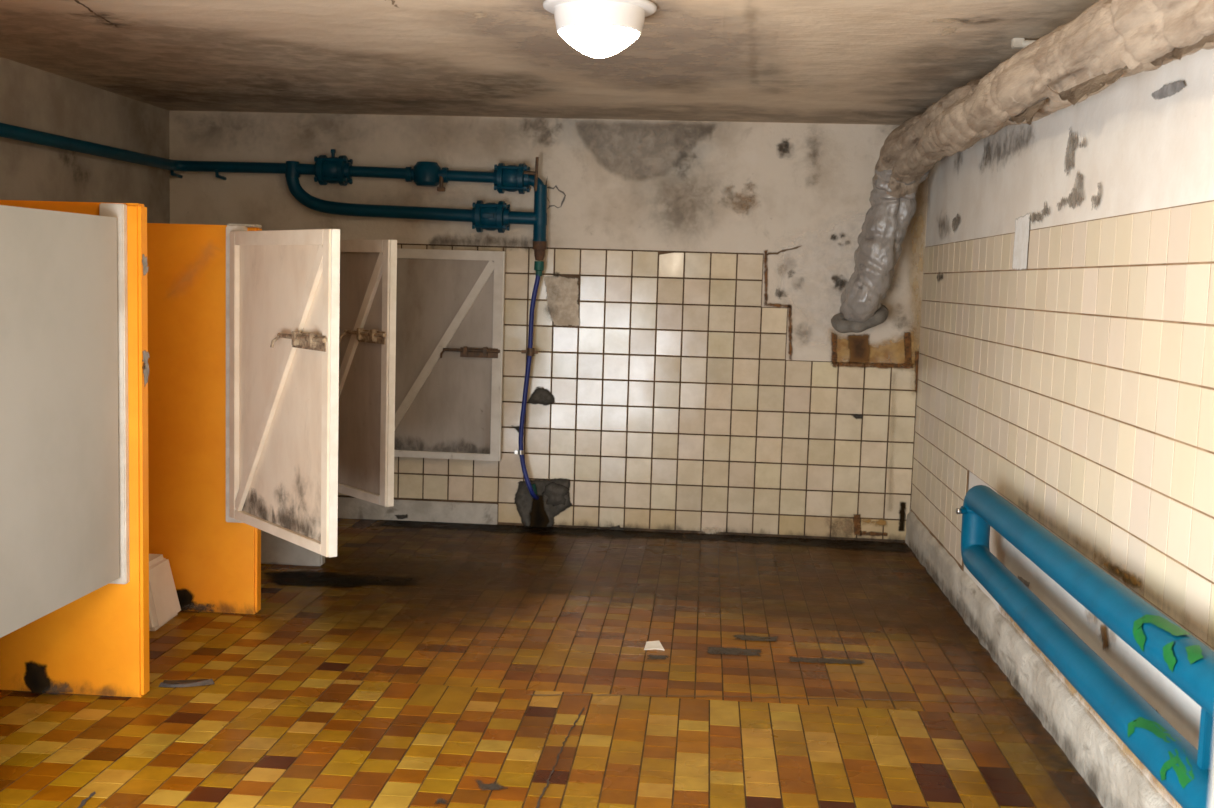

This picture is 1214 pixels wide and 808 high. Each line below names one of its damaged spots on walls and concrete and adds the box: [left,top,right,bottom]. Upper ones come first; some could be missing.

crack [74,0,117,27]
leakage [477,9,735,83]
leakage [579,124,711,178]
peeling [1031,132,1101,225]
corrosion [831,215,924,392]
leakage [1001,607,1182,808]